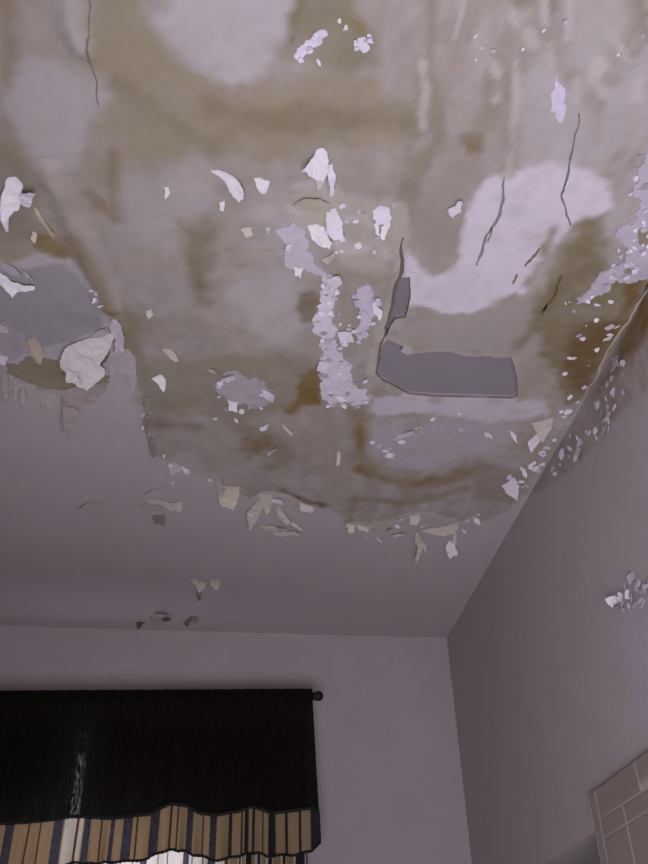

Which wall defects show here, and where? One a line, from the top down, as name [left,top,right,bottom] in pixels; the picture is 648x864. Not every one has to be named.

crack [79,0,99,106]
peeling [294,29,328,66]
peeling [0,262,35,298]
peeling [0,177,55,243]
peeling [211,170,244,212]
damp [0,0,648,528]
spalling [266,148,524,409]
crack [476,177,505,266]
crack [560,114,580,226]
peeling [564,152,648,313]
peeling [0,319,137,439]
peeling [207,369,276,423]